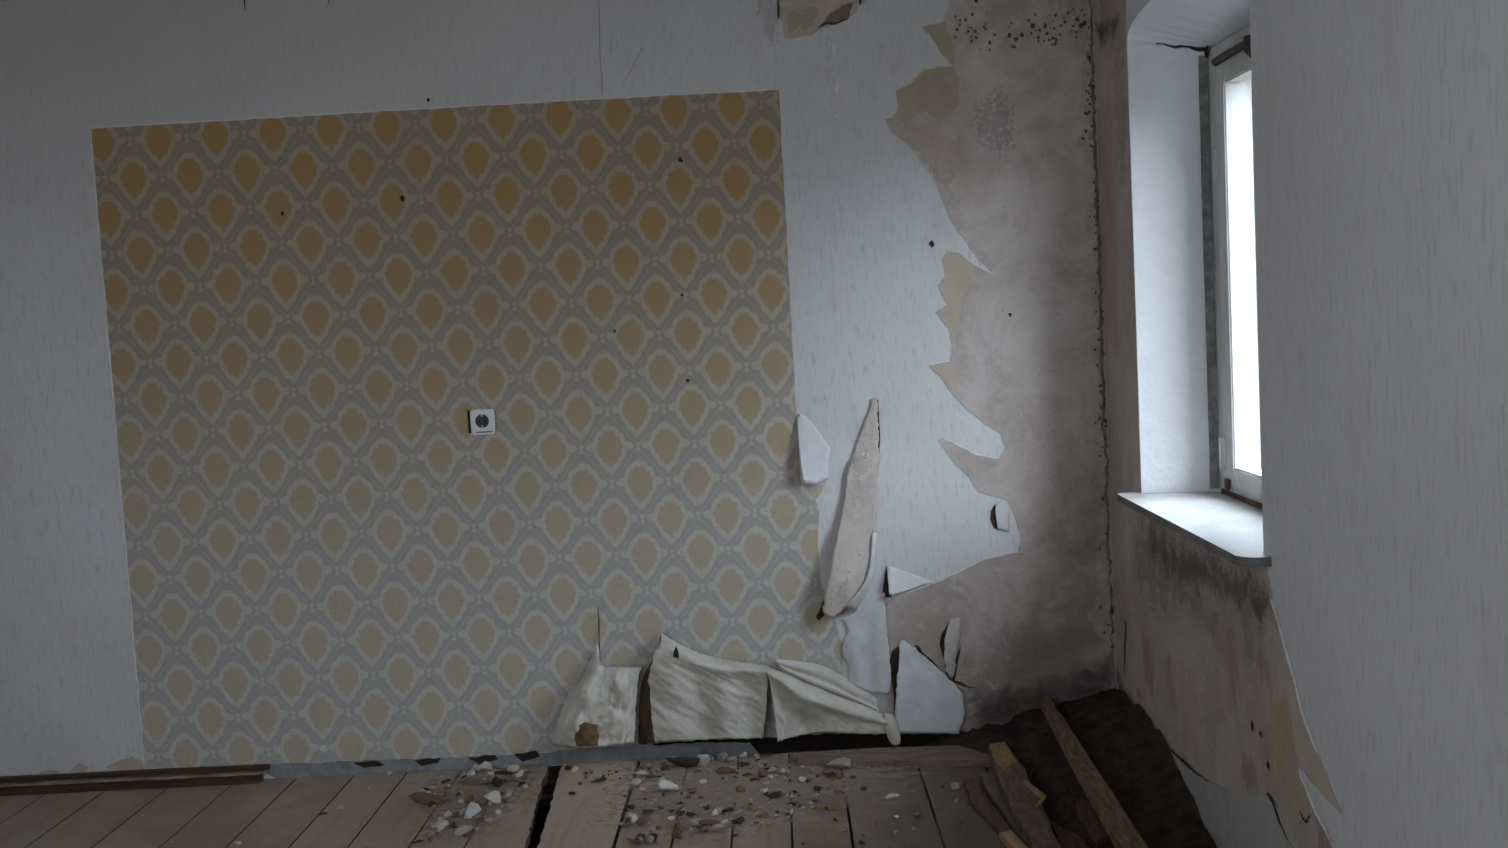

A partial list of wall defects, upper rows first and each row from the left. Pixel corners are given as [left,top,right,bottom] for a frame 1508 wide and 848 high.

peeling [266,0,1343,848]
water stain [954,0,1133,732]
water stain [1136,517,1271,661]